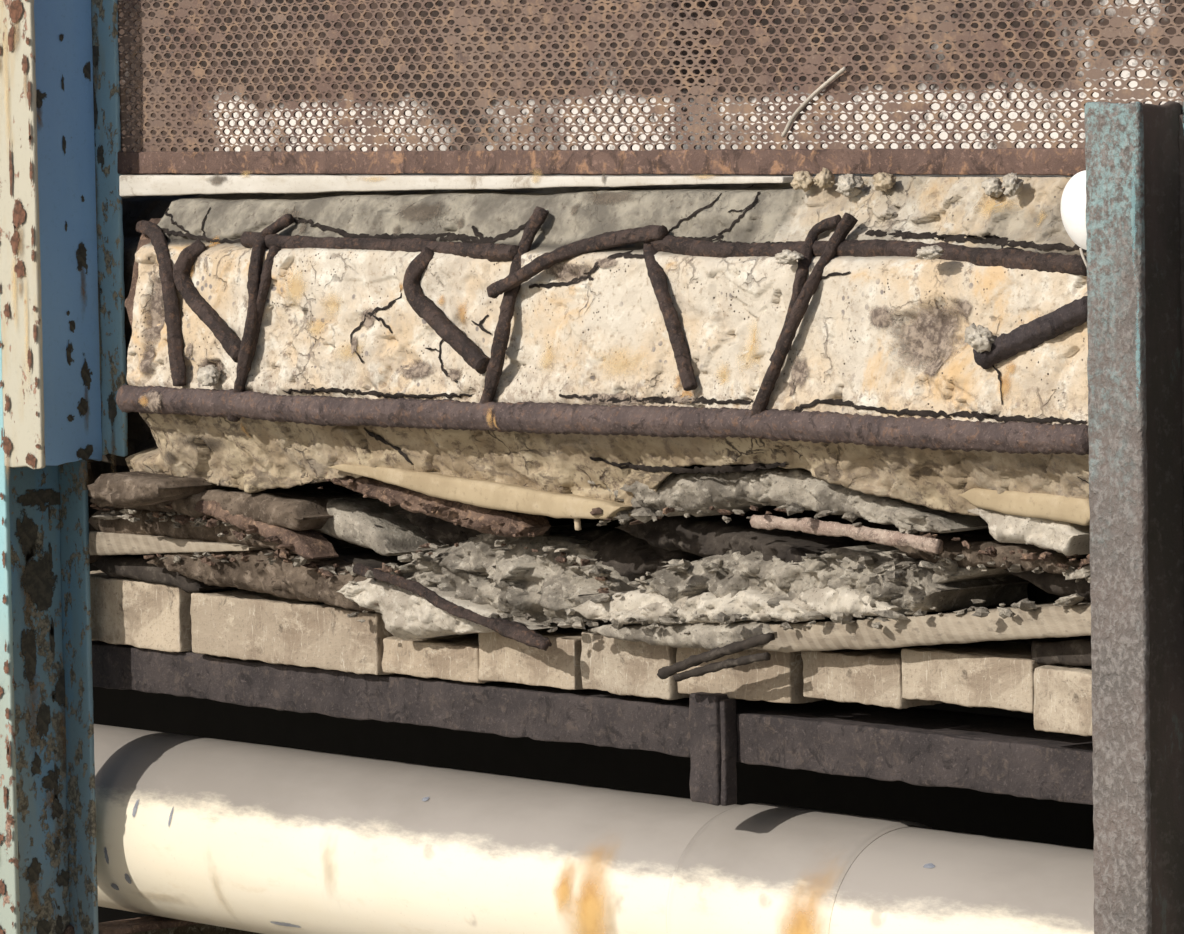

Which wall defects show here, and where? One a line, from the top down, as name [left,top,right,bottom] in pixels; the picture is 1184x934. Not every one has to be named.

corrosion [0,0,28,75]
corrosion [9,141,25,291]
crack [668,184,789,244]
crack [529,250,645,289]
spalling [139,271,165,374]
crack [283,293,473,399]
spalling [401,360,432,380]
spalling [869,300,971,377]
corrosion [0,436,13,471]
corrosion [14,488,61,612]
peeling [967,508,1090,556]
corrosion [557,877,604,934]